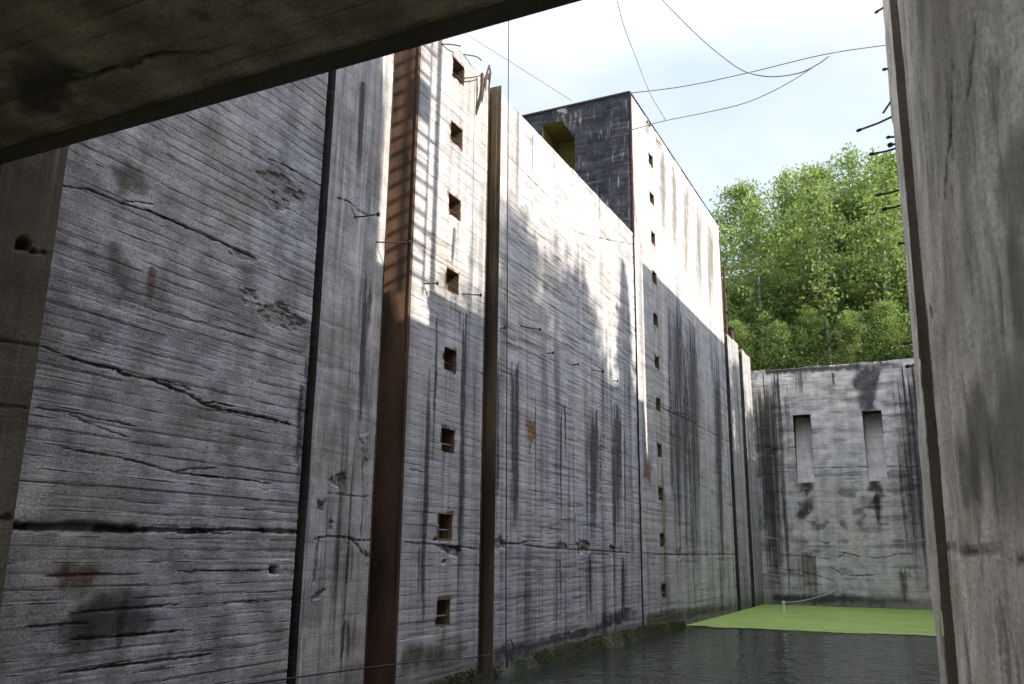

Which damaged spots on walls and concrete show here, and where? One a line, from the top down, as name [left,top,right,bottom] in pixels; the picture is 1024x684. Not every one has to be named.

crack [63,185,240,252]
crack [0,336,292,427]
crack [61,410,138,438]
water stain [496,361,519,521]
rust [527,420,535,453]
water stain [752,364,892,604]
crack [319,494,370,556]
crack [778,541,913,578]
water stain [69,591,151,650]